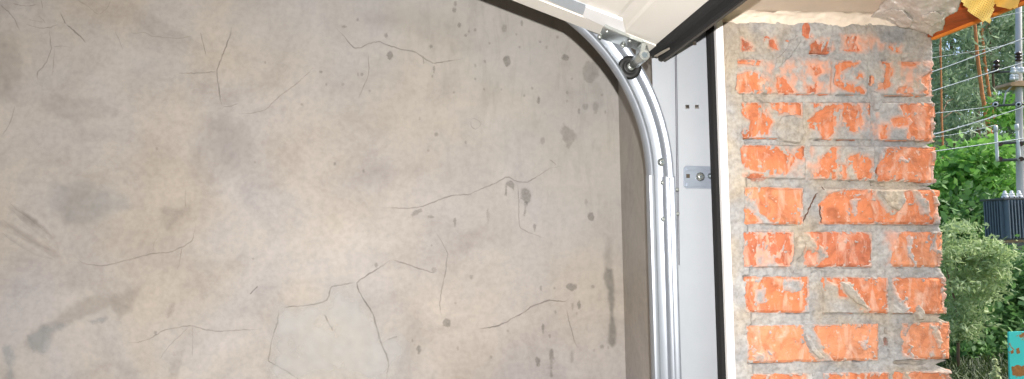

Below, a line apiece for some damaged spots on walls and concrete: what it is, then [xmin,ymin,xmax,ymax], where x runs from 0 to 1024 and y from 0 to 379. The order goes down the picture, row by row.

peeling [871,0,961,36]
crack [803,186,825,223]